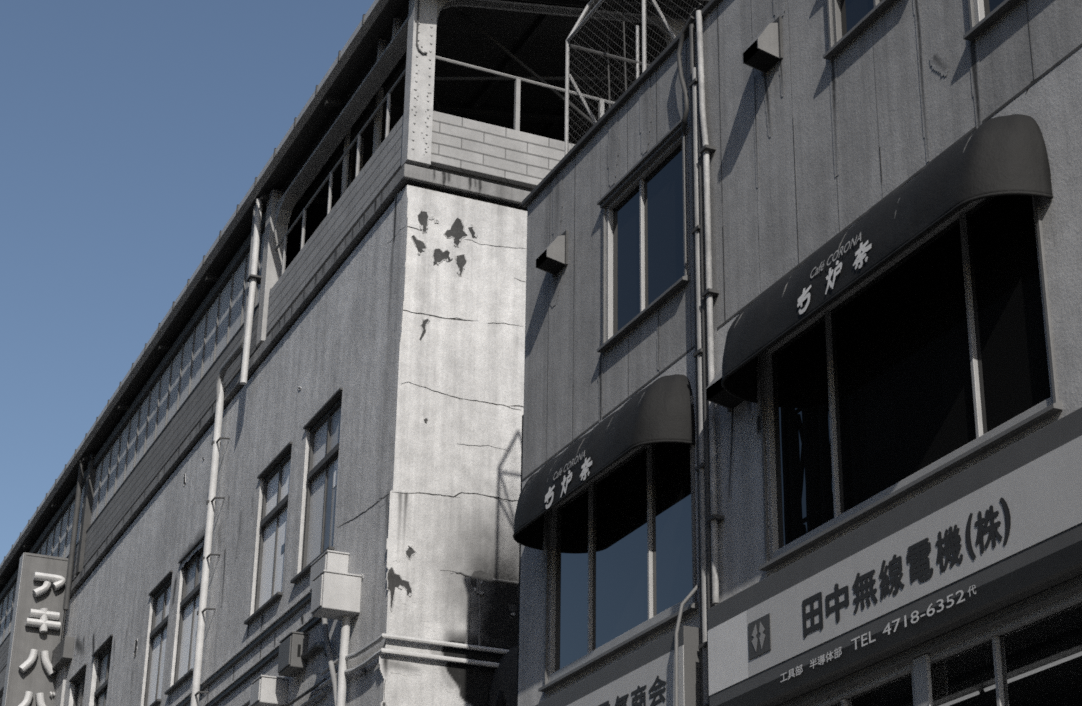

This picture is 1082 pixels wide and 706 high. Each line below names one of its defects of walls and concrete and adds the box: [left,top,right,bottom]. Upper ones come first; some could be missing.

spalling [411,210,478,277]
crack [403,310,519,326]
crack [402,382,524,410]
crack [339,492,518,527]
spalling [386,567,412,612]
water stain [475,568,518,620]